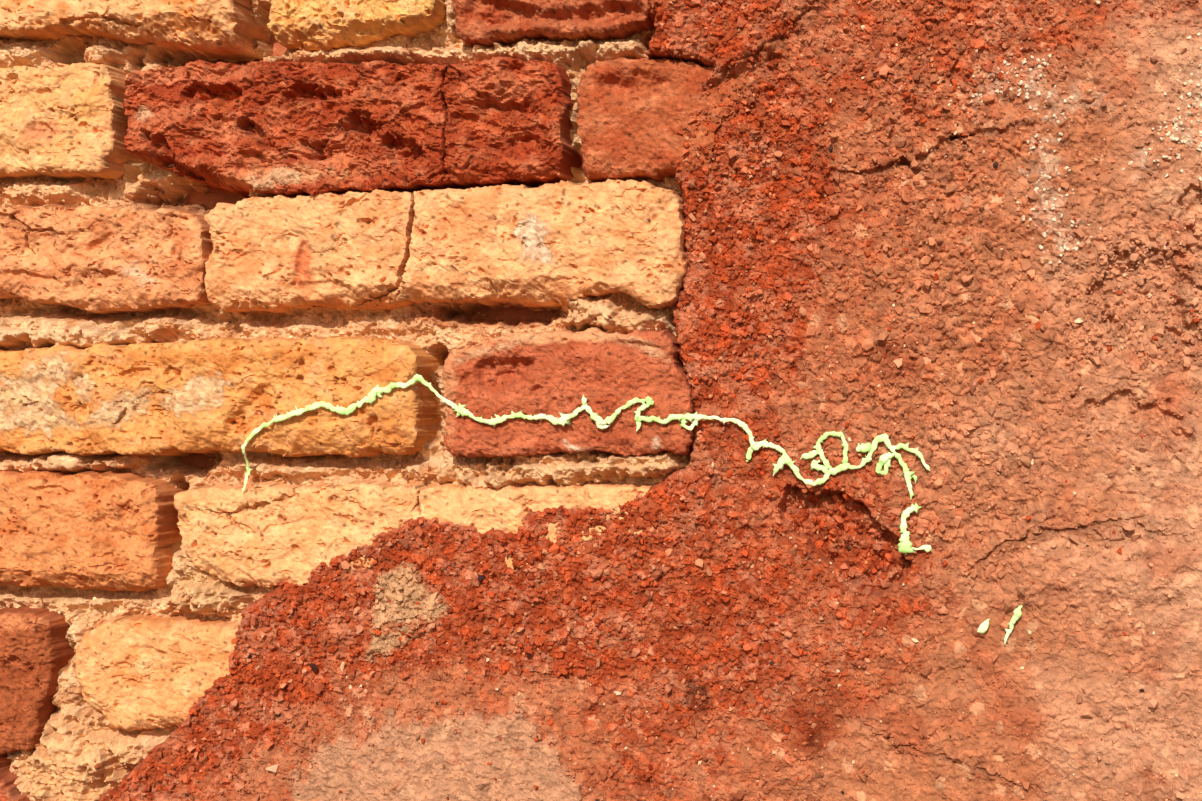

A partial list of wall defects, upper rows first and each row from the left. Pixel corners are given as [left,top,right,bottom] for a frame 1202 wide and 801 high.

spalling [347,18,389,40]
spalling [459,0,655,40]
crack [819,119,1025,184]
spalling [91,45,915,801]
spalling [30,490,73,505]
crack [958,514,1193,578]
spalling [0,646,57,715]